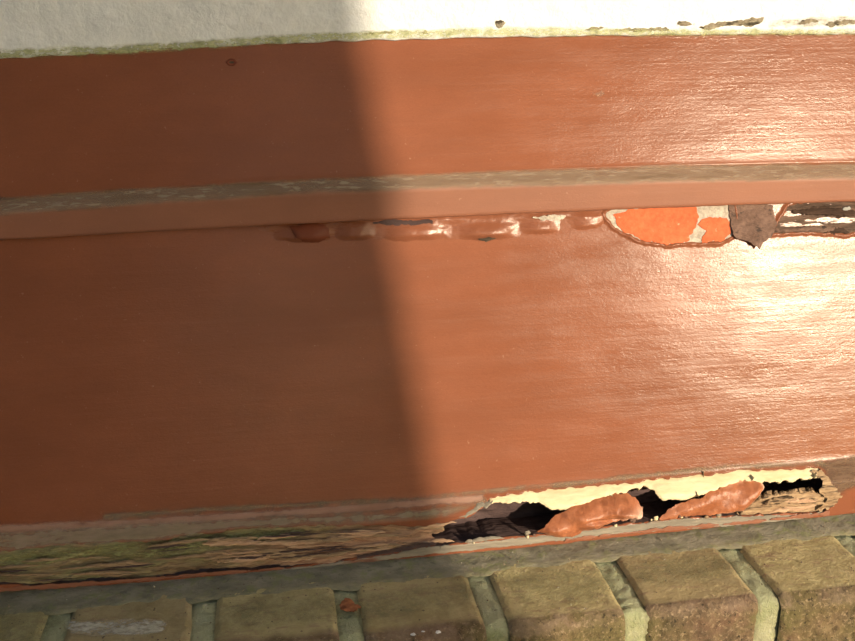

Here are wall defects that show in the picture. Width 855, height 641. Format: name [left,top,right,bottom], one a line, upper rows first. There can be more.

spalling [601,204,777,249]
peeling [537,493,643,537]
peeling [659,480,764,520]